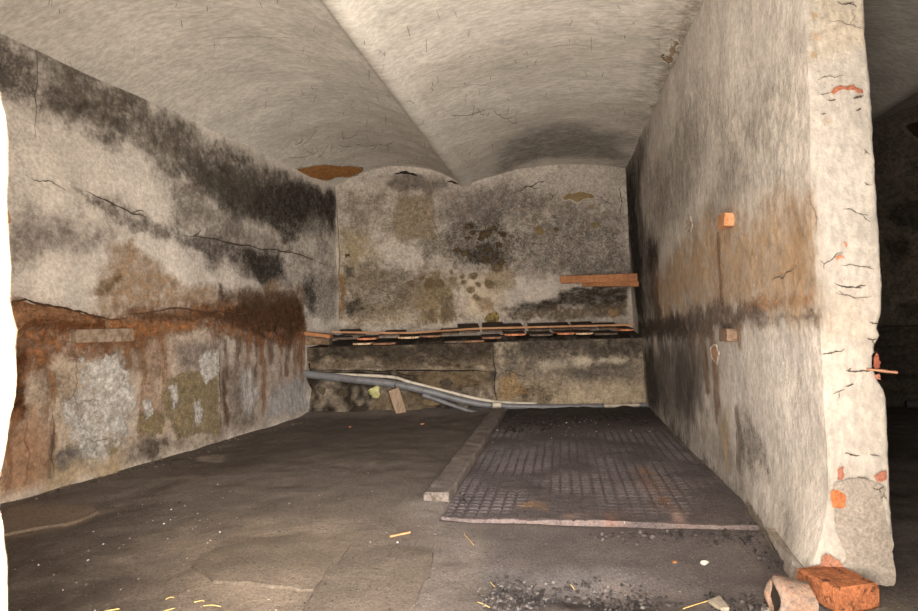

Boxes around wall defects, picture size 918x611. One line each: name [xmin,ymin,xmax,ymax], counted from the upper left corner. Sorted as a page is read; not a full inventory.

crack [831,1,863,29]
crack [818,75,864,115]
spalling [831,85,863,94]
crack [26,175,146,217]
spalling [295,164,364,181]
leakage [99,188,625,324]
crack [823,252,872,299]
corrosion [9,284,307,426]
crack [821,349,869,399]
leakage [47,435,119,484]
leakage [140,439,165,458]
spalling [820,467,896,586]